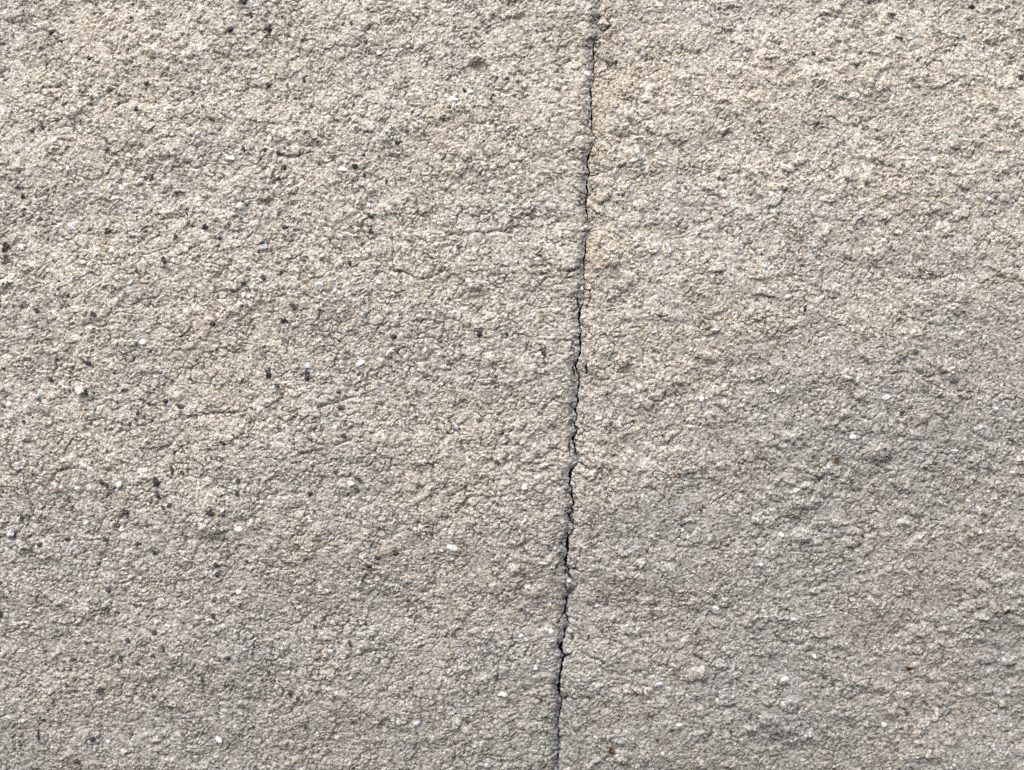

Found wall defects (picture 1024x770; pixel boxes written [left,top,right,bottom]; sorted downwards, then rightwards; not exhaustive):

crack [555,0,612,764]